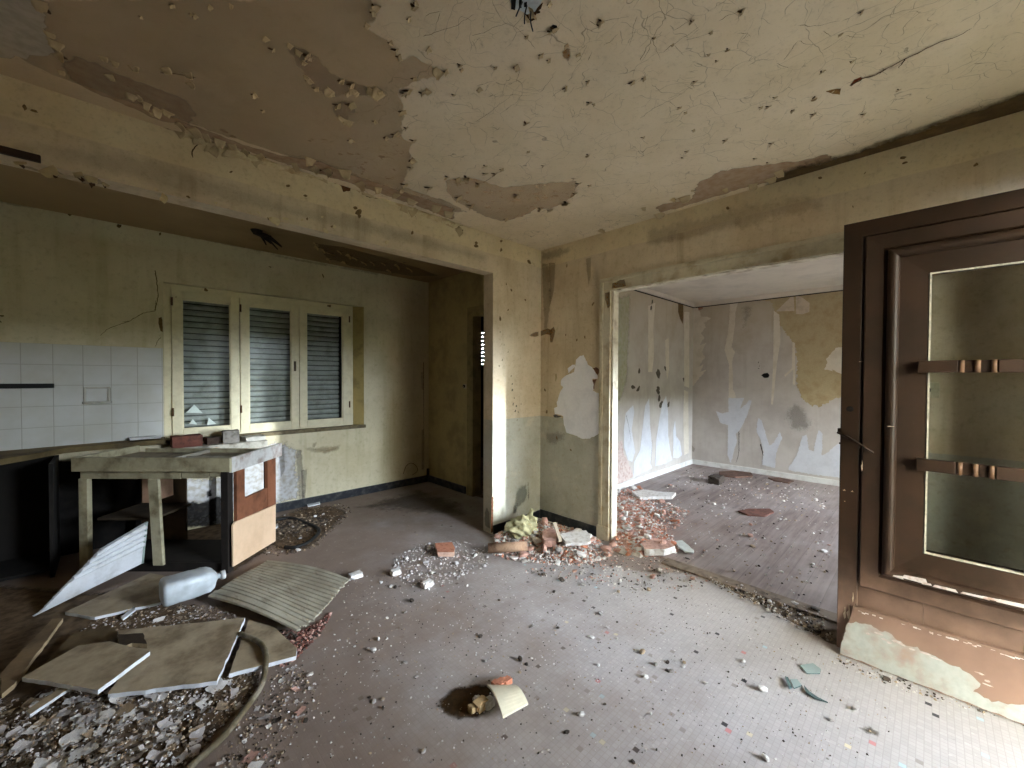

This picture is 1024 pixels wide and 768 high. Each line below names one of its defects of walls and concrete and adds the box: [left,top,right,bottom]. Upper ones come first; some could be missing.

peeling [262,36,385,144]
crack [477,1,970,143]
peeling [56,55,504,237]
peeling [641,155,833,219]
peeling [656,366,670,408]
flaking render [617,440,633,484]
peeling [837,622,1024,724]